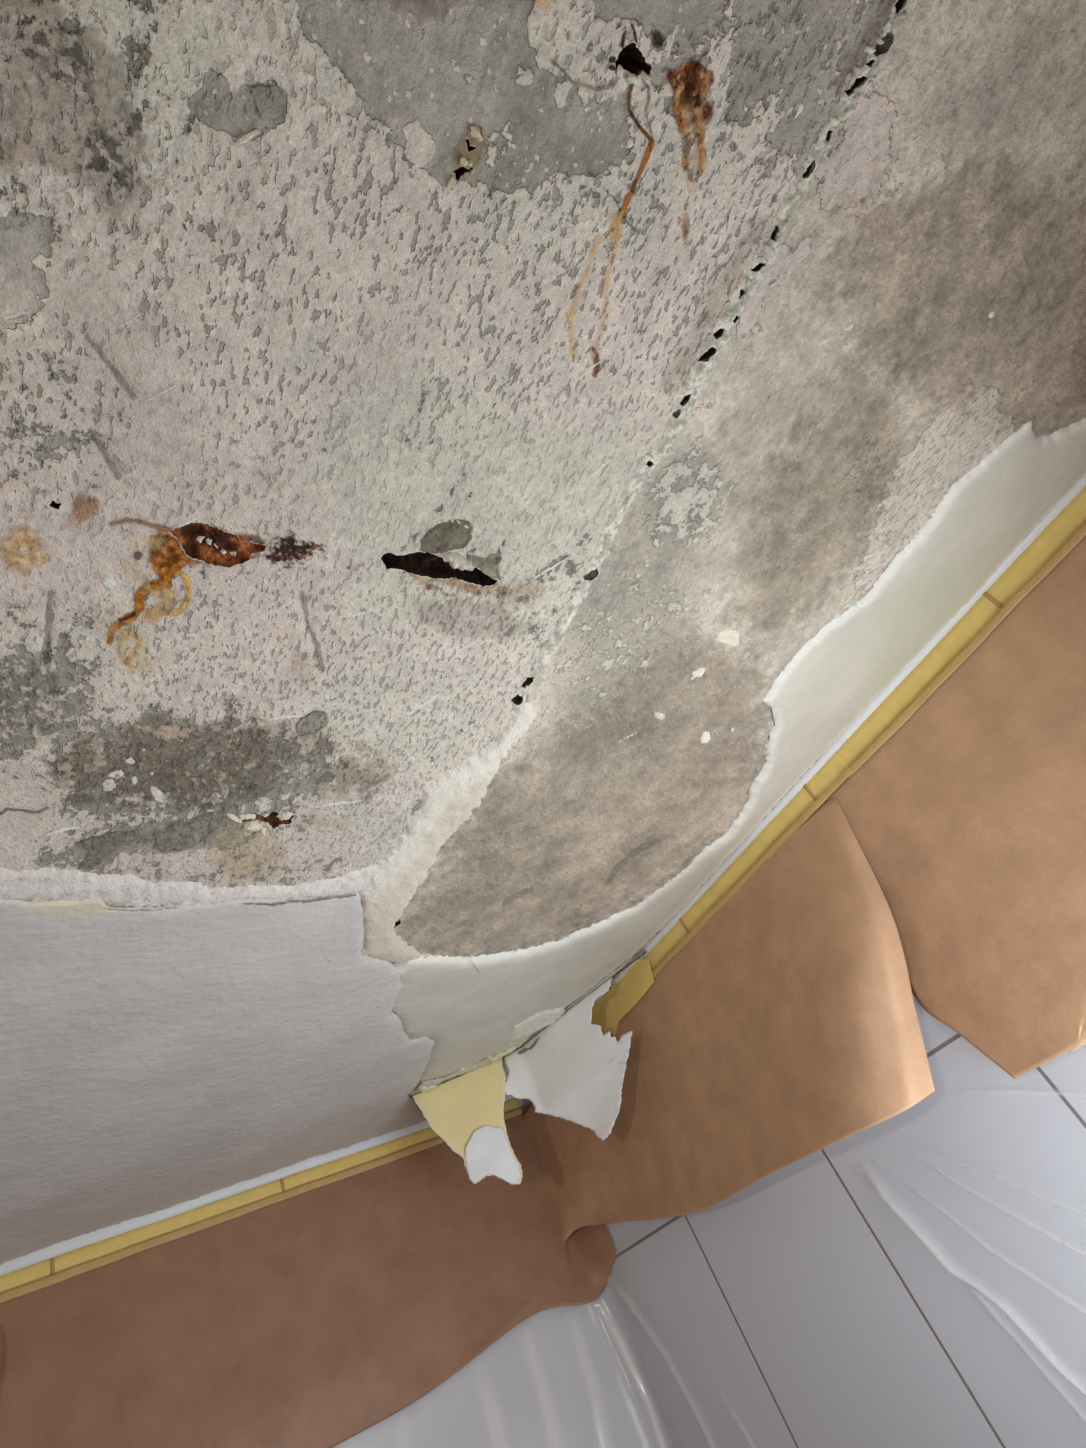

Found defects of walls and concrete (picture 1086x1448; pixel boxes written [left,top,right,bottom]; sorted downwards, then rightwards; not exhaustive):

rust [582,81,655,283]
rust [667,61,714,177]
spalling [87,336,137,400]
crack [511,0,911,706]
damp [832,158,1086,436]
rust [74,498,98,521]
rust [107,519,203,669]
rust [210,525,324,568]
damp [738,361,899,623]
damp [48,715,324,811]
peeling [0,417,1086,1265]
damp [406,637,769,952]